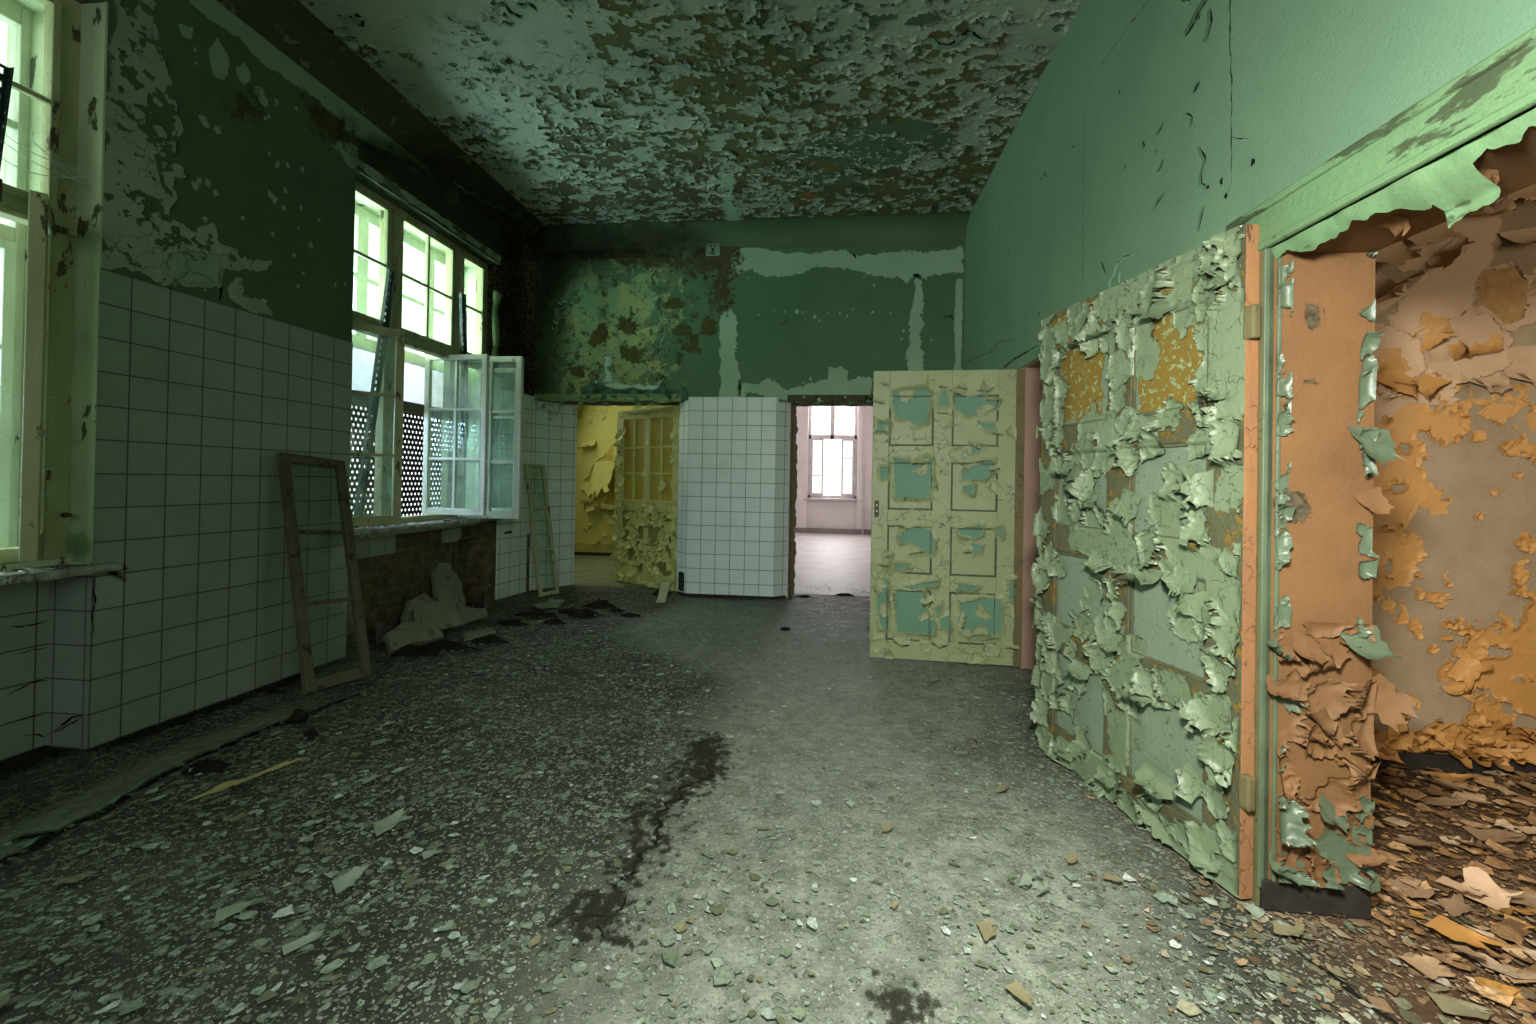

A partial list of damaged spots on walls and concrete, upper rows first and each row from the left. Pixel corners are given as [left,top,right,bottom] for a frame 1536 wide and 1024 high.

peeling [102,0,684,643]
peeling [716,225,1307,937]
flaking render [1266,167,1536,917]
peeling [1500,887,1536,929]